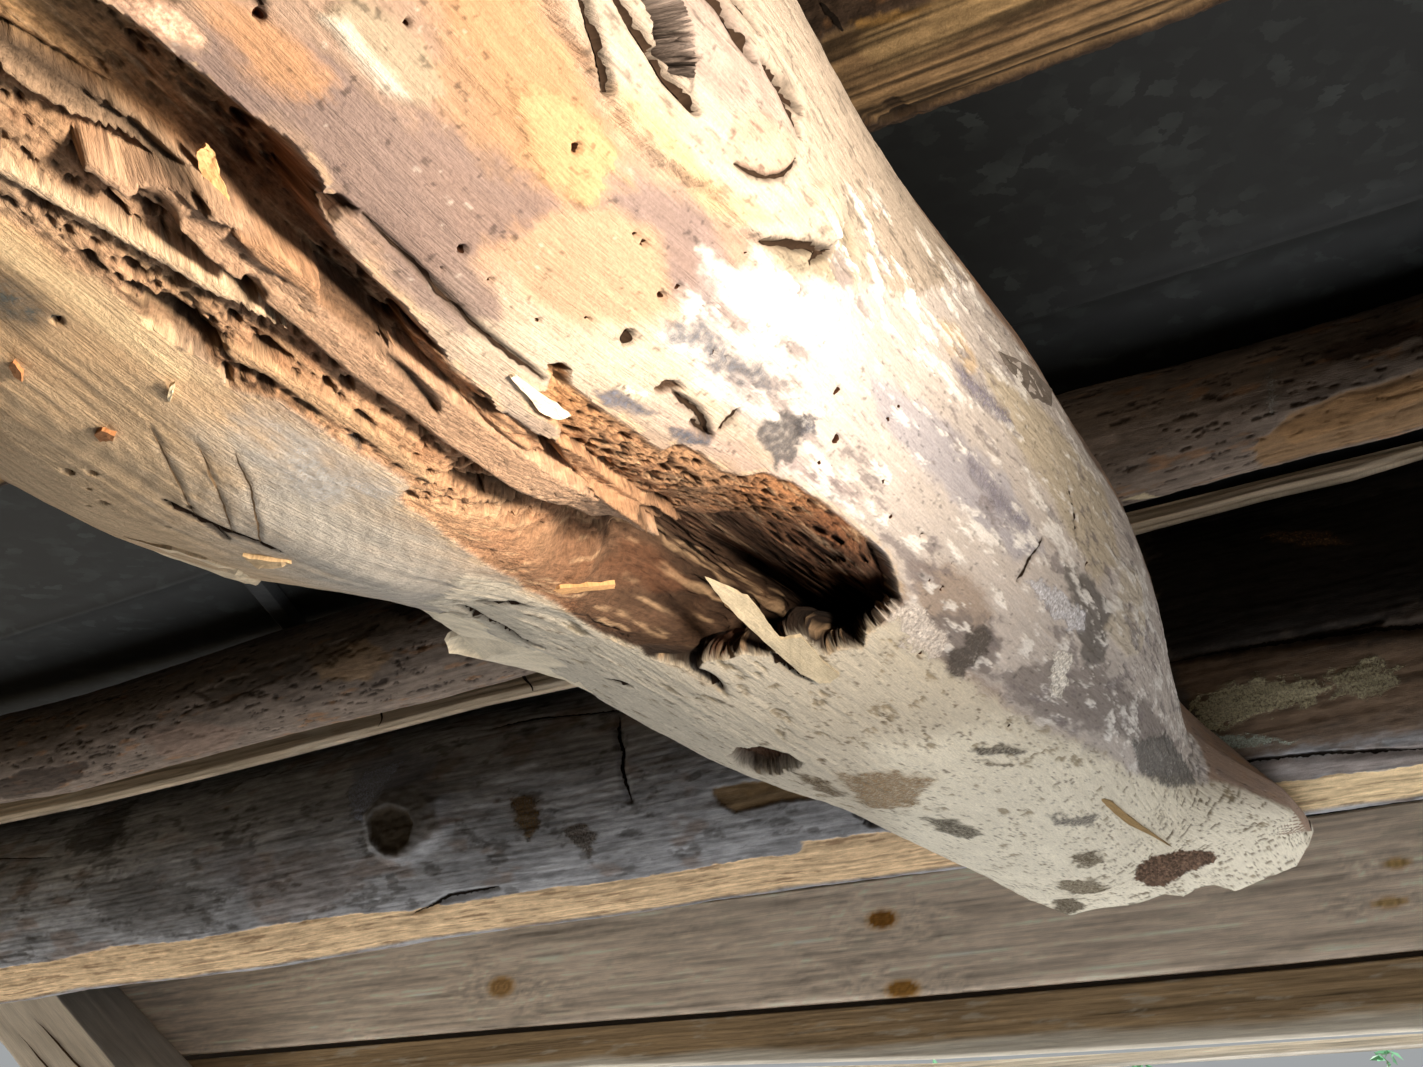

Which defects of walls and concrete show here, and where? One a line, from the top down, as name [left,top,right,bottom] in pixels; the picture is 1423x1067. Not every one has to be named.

crack [578,0,694,113]
crack [705,0,796,179]
crack [820,2,844,31]
spalling [0,0,947,685]
crack [148,425,281,552]